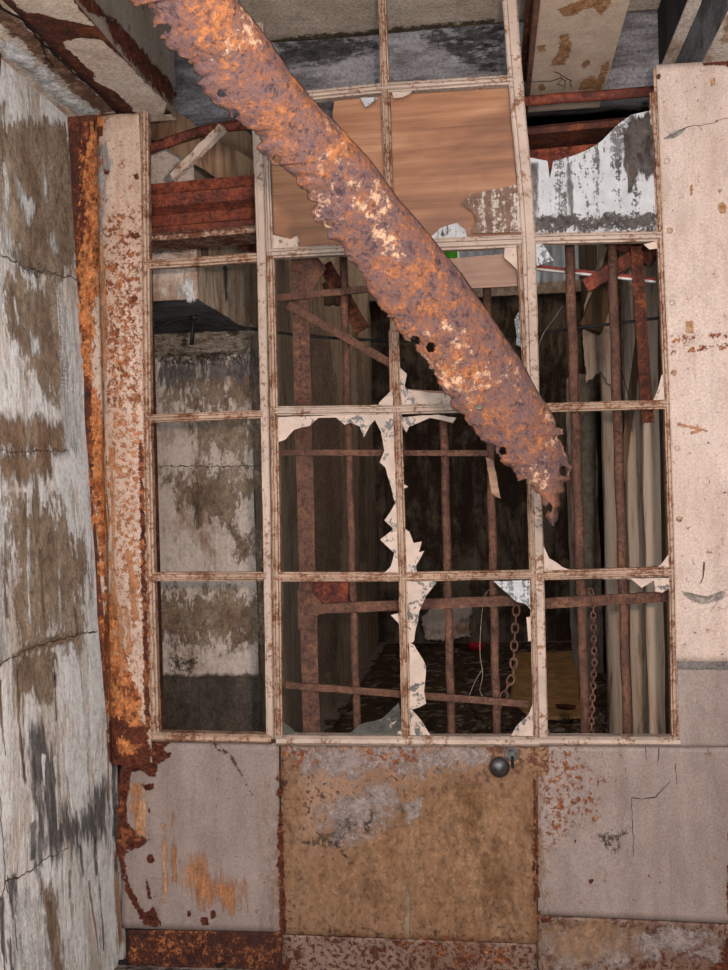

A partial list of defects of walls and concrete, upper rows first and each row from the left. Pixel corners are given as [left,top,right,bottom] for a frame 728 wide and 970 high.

leakage [0,211,14,294]
crack [0,247,76,281]
rust [671,320,728,355]
rust [0,0,246,949]
crack [0,631,97,666]
leakage [0,290,118,970]
rust [275,746,318,798]
rust [360,746,419,772]
crack [0,798,67,970]
rust [276,810,287,934]
rust [532,749,606,923]
rust [711,935,728,970]